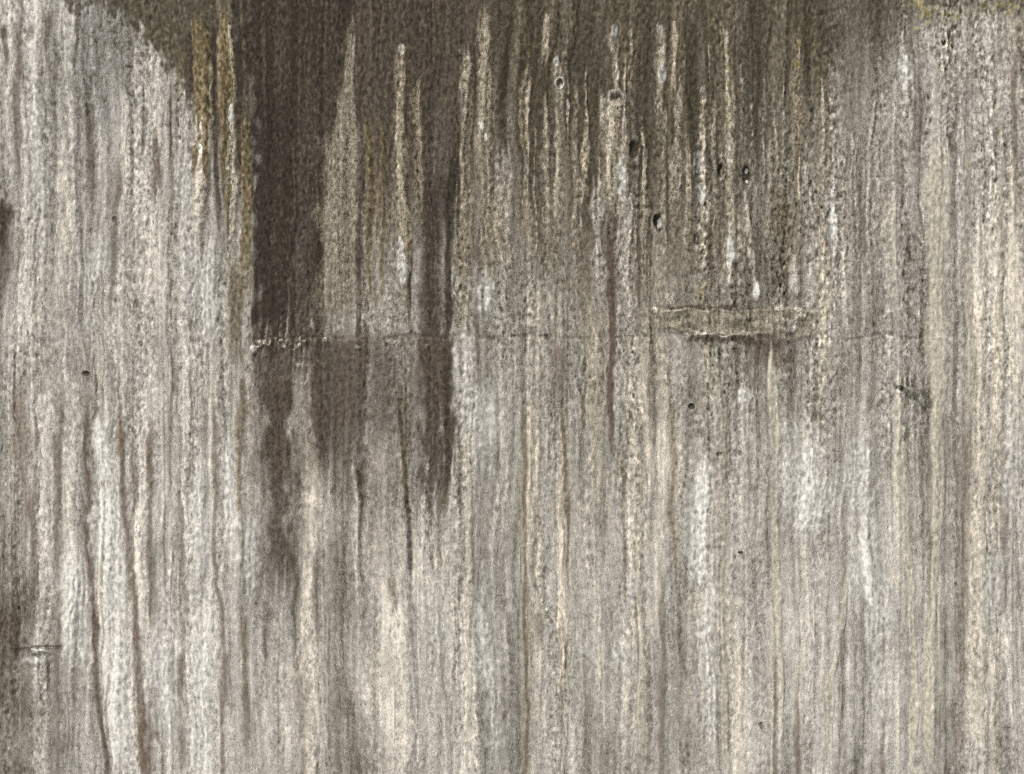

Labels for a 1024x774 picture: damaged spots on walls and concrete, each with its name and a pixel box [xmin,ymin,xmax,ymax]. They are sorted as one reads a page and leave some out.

water stain [185,114,205,226]
water stain [202,255,214,334]
efflorescence [225,104,237,222]
water stain [231,0,760,581]
water stain [766,119,776,242]
efflorescence [789,258,814,304]
efflorescence [825,178,838,270]
water stain [850,106,880,233]
water stain [193,416,238,568]
water stain [155,618,209,773]